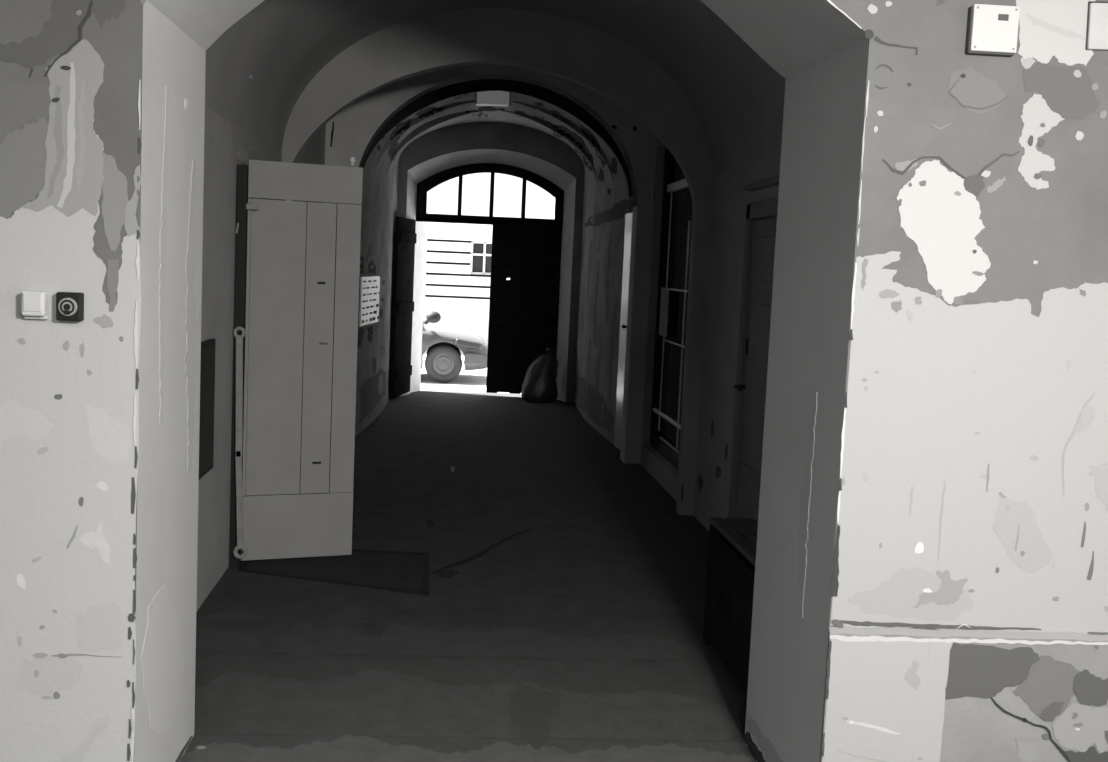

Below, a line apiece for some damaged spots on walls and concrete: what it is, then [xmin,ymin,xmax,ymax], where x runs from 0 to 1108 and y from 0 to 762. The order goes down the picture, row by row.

peeling [1016,0,1095,77]
flaking render [0,80,142,762]
flaking render [822,80,1108,762]
crack [840,620,1041,630]
crack [991,698,1071,762]